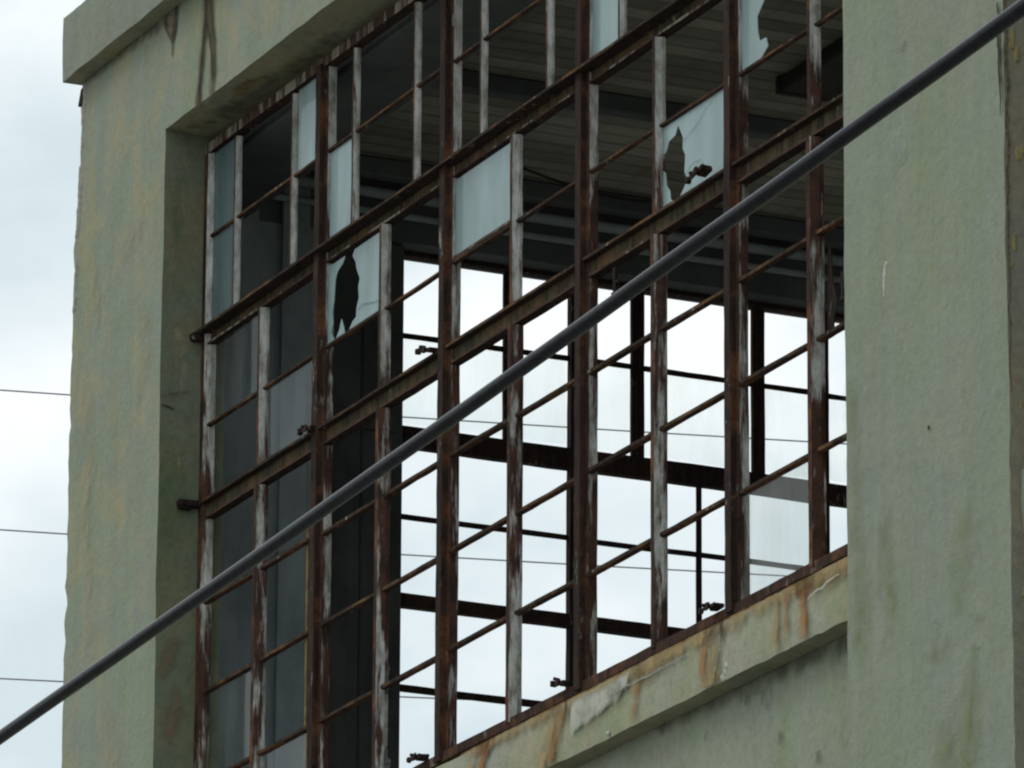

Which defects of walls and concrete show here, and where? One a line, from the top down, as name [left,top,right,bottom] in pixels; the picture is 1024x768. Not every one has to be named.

leakage [195,0,215,107]
rust [464,556,848,768]